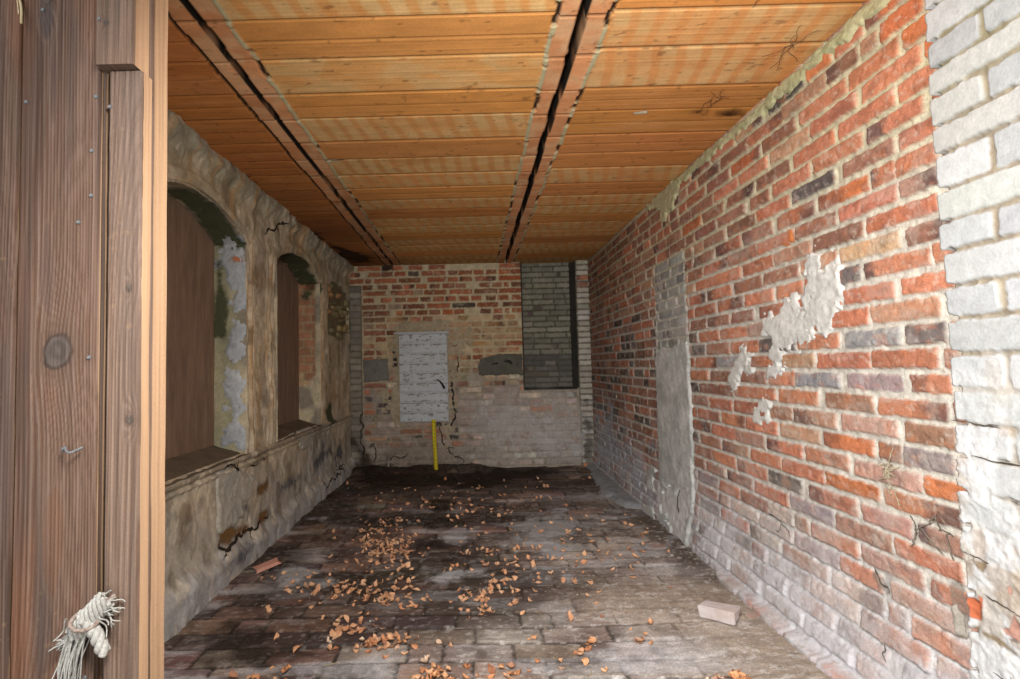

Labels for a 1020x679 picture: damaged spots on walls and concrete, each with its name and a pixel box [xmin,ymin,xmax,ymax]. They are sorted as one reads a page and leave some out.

crack [265,221,289,234]
crack [322,358,465,490]
crack [950,420,1000,429]
crack [971,455,1020,466]
crack [218,513,269,560]
spalling [967,597,982,620]
spalling [1004,616,1020,642]